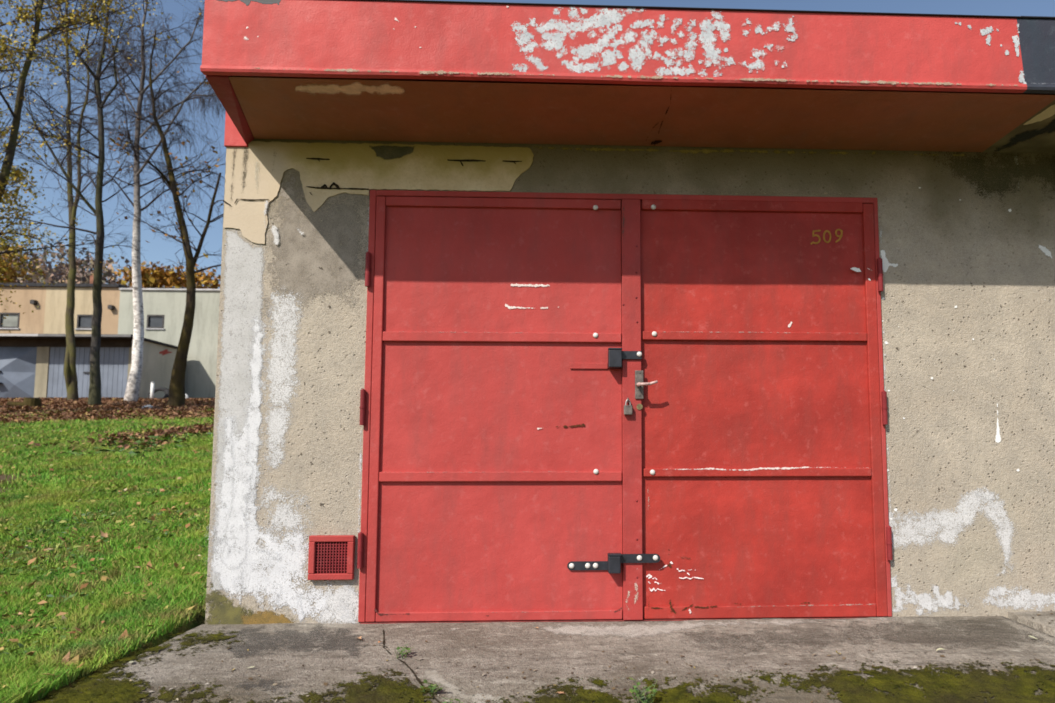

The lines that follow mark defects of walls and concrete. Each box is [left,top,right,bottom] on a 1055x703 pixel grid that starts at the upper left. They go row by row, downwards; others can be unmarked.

peeling [419,7,961,85]
peeling [955,22,1020,57]
leakage [923,119,1055,208]
leakage [204,286,365,659]
leakage [499,485,1055,656]
crack [362,629,460,703]